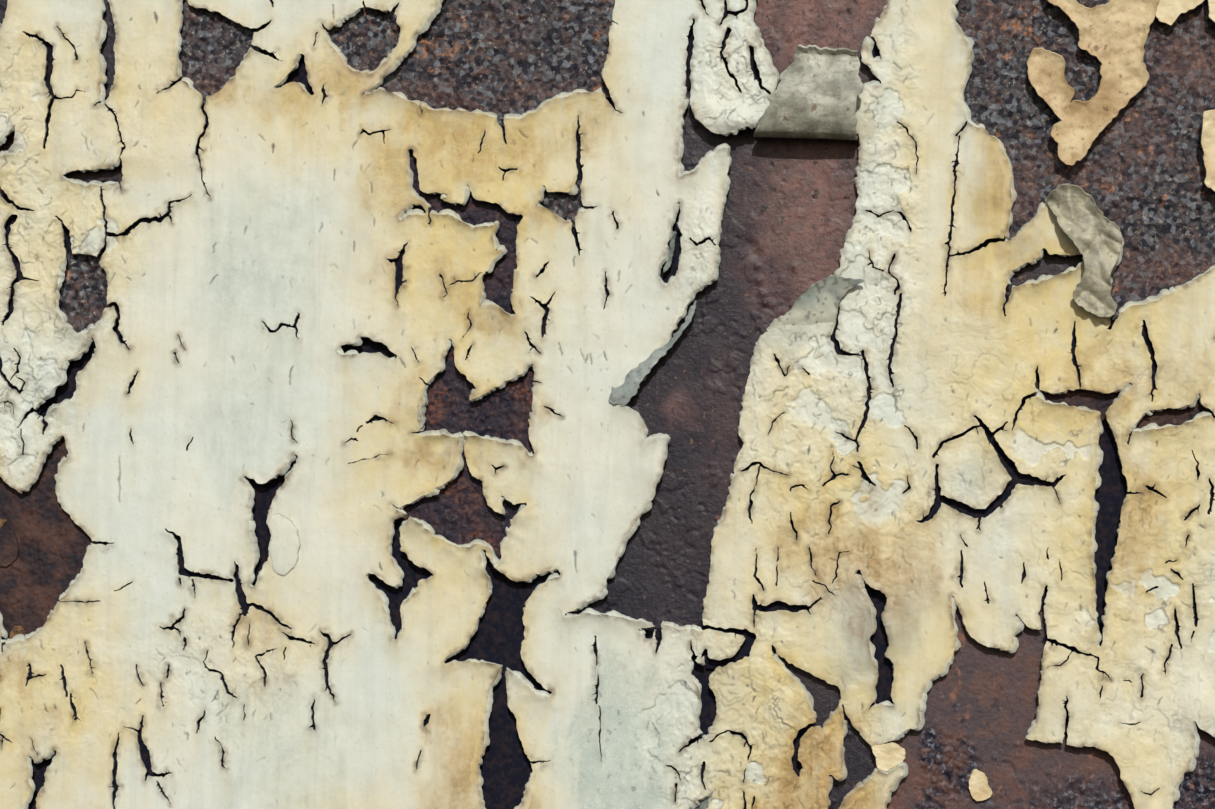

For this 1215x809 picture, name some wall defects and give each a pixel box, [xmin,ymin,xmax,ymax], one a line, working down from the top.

crack [0,215,42,455]
crack [23,26,80,149]
peeling [0,216,130,652]
crack [100,180,189,237]
crack [109,529,351,809]
peeling [157,0,622,196]
peeling [358,331,567,809]
peeling [559,0,894,752]
crack [697,210,1066,669]
peeling [766,562,1145,809]
peeling [948,0,1215,330]
crack [1043,450,1215,725]